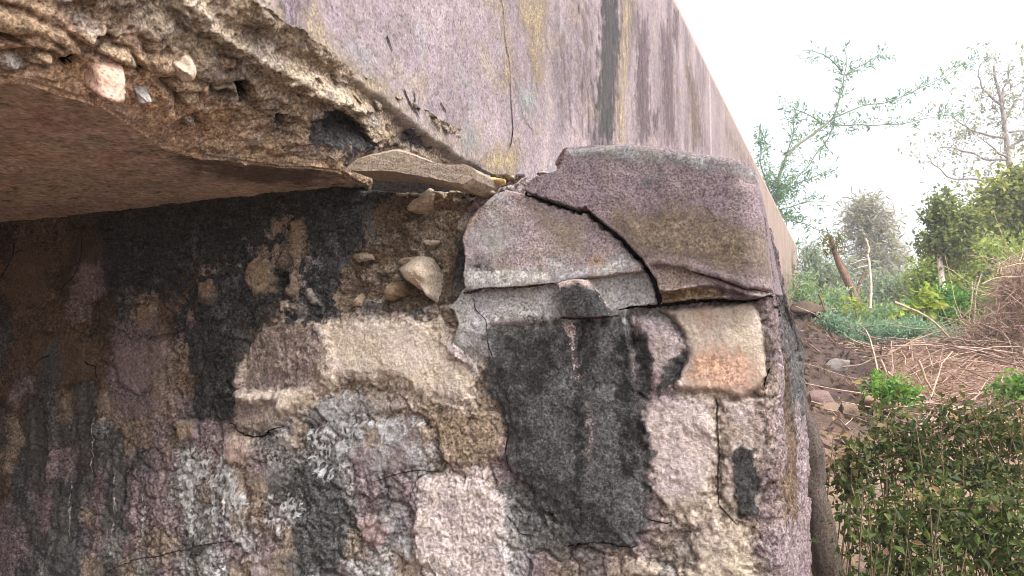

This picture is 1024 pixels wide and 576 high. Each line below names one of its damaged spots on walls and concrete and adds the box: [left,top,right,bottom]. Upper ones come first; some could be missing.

spalling [0,0,461,190]
crack [501,0,533,148]
damp [557,0,679,146]
damp [98,155,389,364]
spalling [333,190,476,313]
spalling [482,172,519,187]
crack [525,192,789,389]
damp [193,370,231,422]
damp [464,203,770,550]
crack [715,399,737,525]